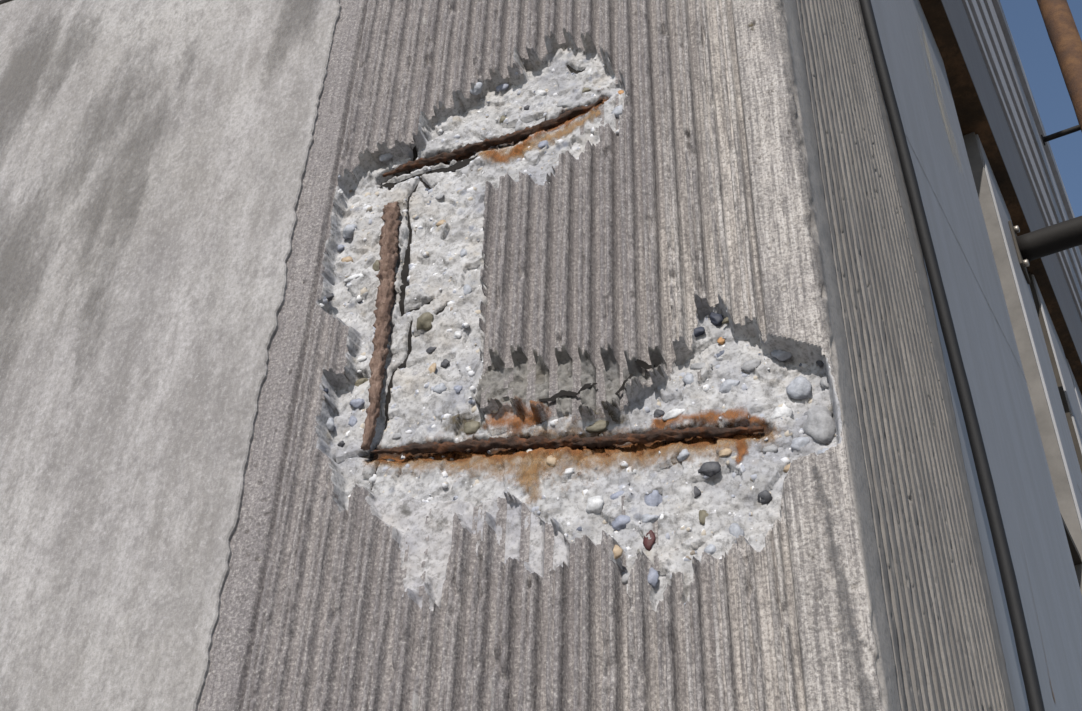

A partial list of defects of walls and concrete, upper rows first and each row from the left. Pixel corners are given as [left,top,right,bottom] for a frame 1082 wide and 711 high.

corrosion [383,95,609,177]
crack [361,177,447,490]
corrosion [360,201,775,499]
spalling [315,28,842,612]
crack [539,359,655,402]